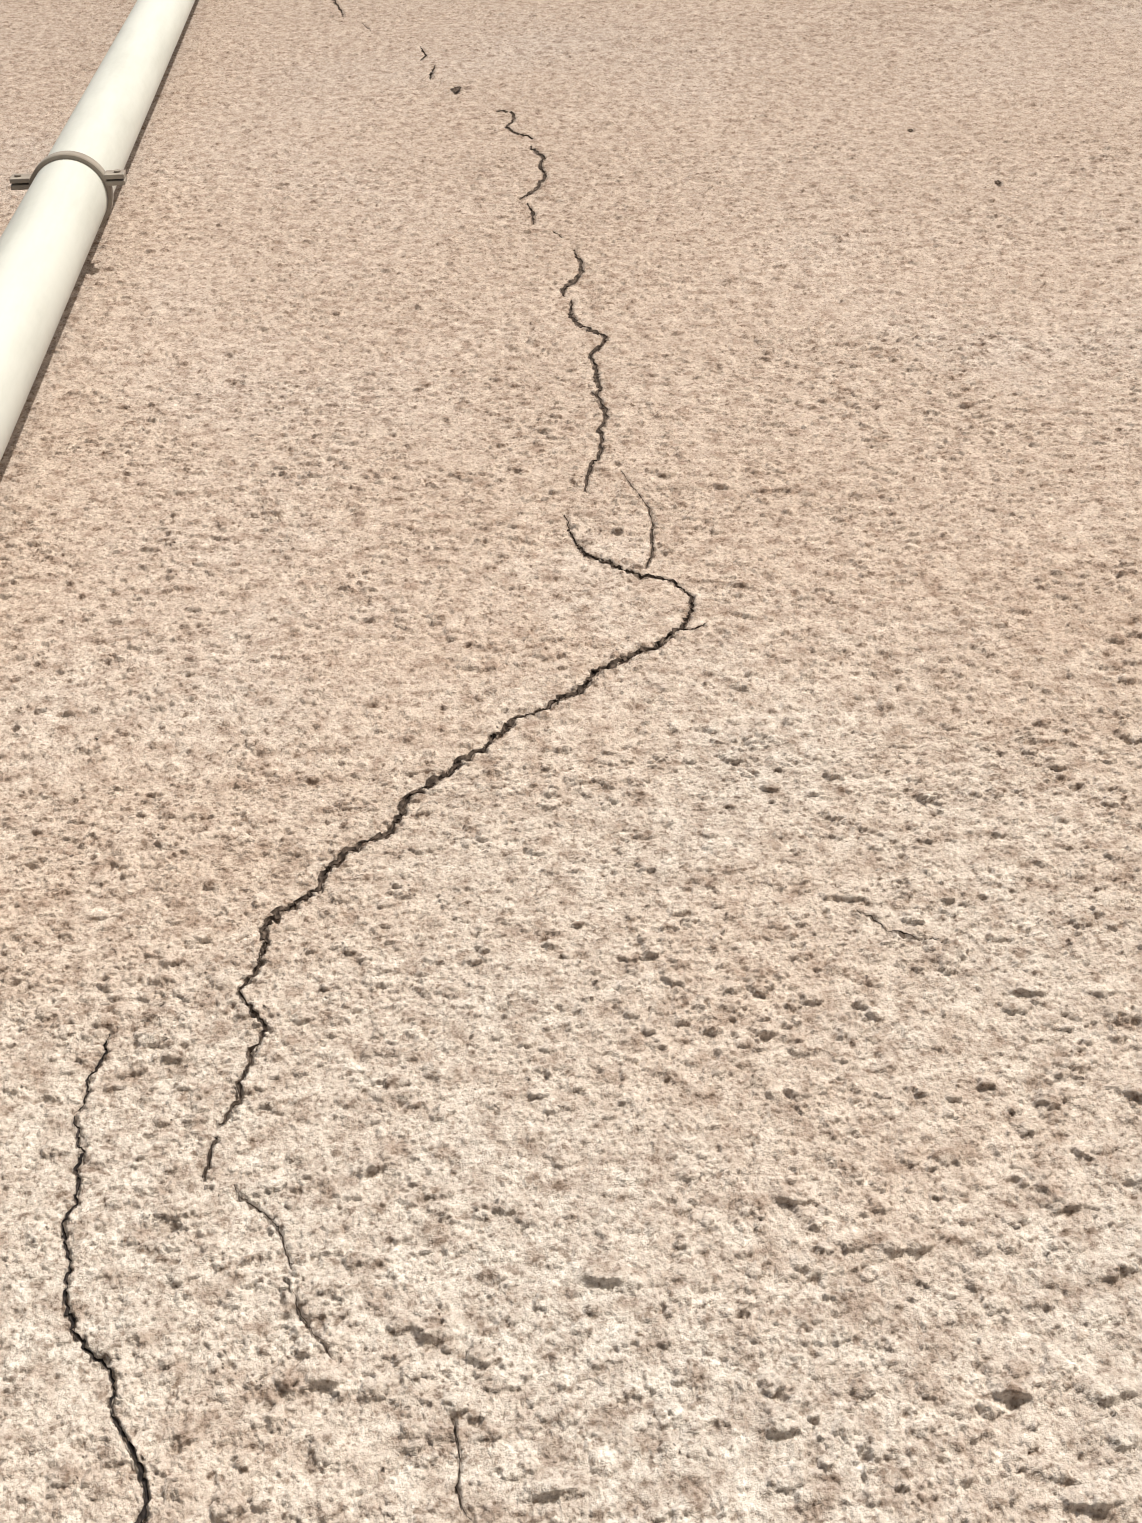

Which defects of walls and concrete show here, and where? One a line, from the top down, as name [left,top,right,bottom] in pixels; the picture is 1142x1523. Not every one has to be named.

crack [203,110,705,1360]
crack [61,1035,149,1523]
crack [453,1417,471,1520]